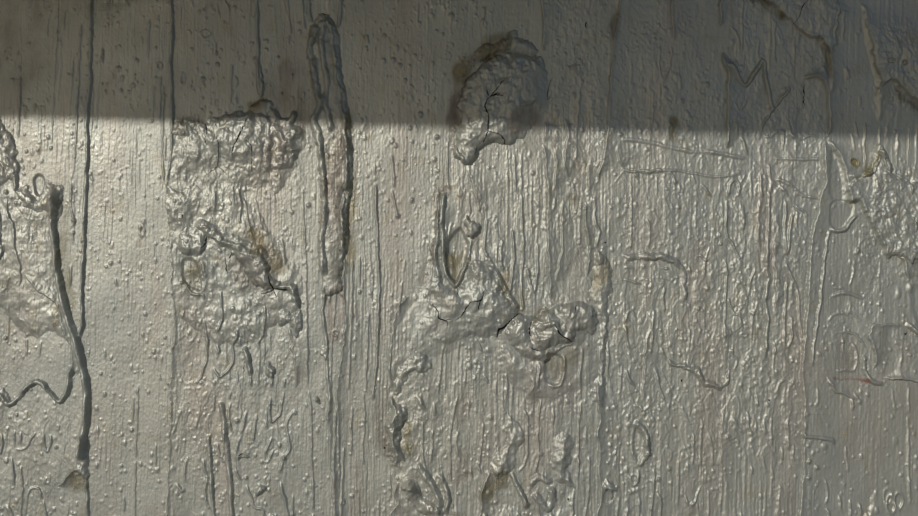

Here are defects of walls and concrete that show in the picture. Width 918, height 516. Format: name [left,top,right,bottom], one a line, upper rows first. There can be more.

peeling [720,52,757,149]
peeling [802,58,848,137]
peeling [895,248,918,282]
peeling [0,274,91,408]
peeling [866,323,902,369]
peeling [864,487,897,516]